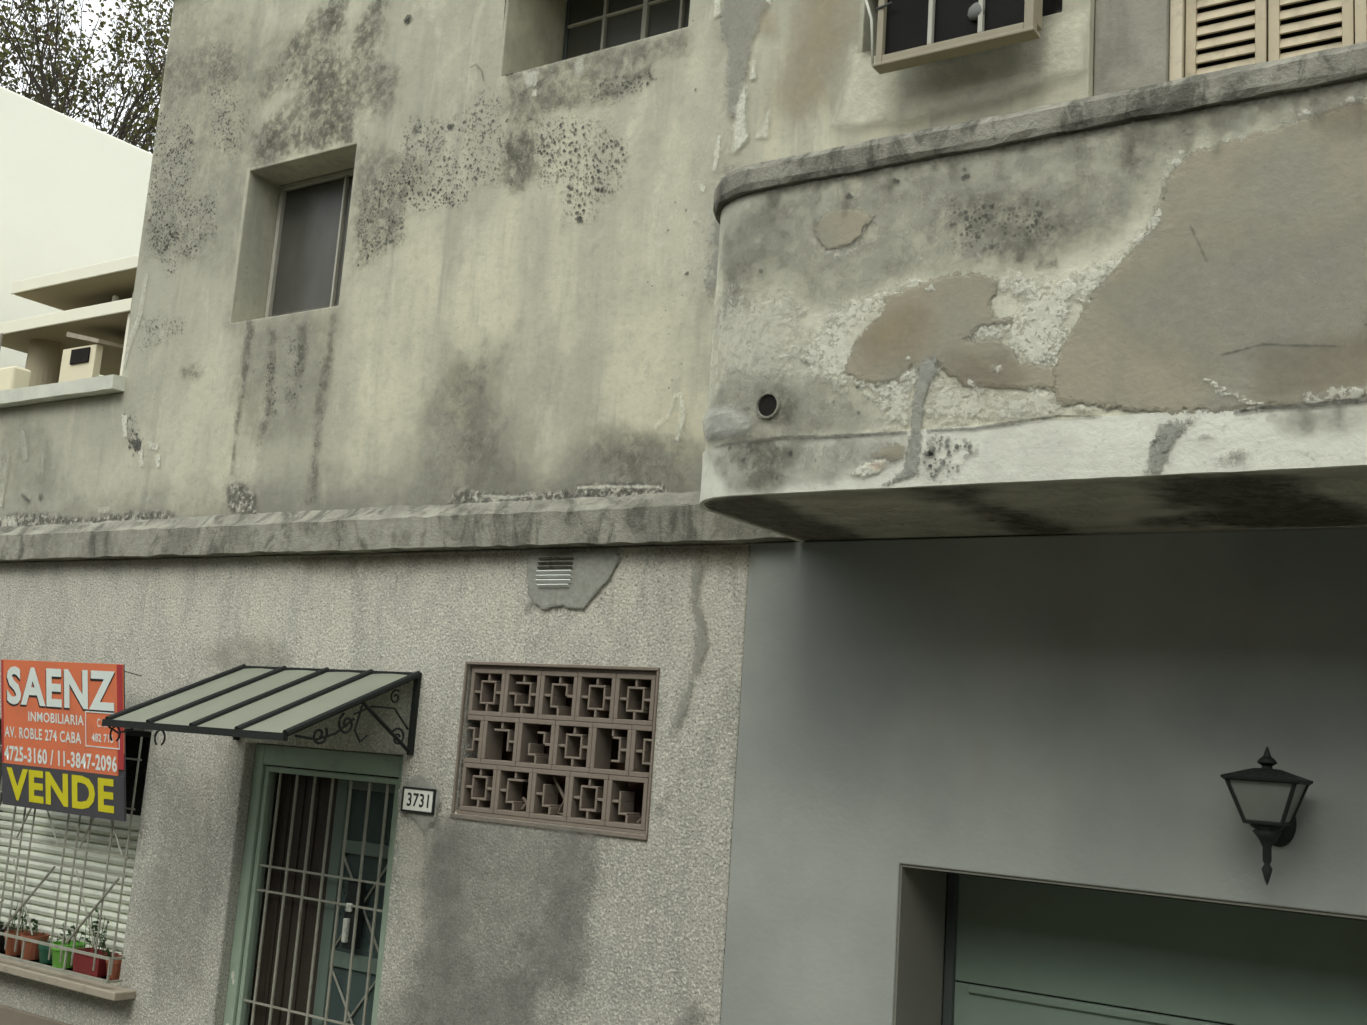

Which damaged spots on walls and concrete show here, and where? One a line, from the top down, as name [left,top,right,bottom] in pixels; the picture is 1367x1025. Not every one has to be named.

water stain [260,4,396,156]
peeling [712,62,769,175]
peeling [839,14,1086,124]
water stain [149,112,215,256]
water stain [357,171,465,266]
peeling [685,95,1367,487]
water stain [233,323,305,457]
flaking render [0,494,174,527]
flaking render [450,482,667,503]
water stain [910,488,1068,534]
water stain [1155,476,1367,528]